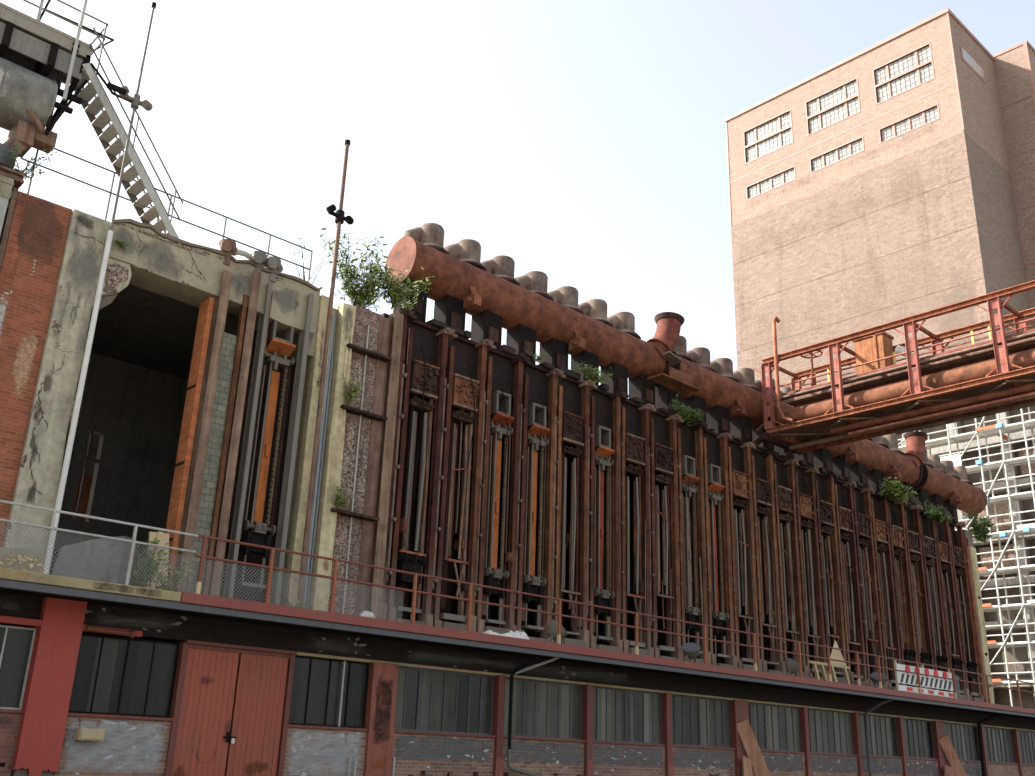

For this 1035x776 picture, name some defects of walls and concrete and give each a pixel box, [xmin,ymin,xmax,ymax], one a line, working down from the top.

crack [28,347,75,503]